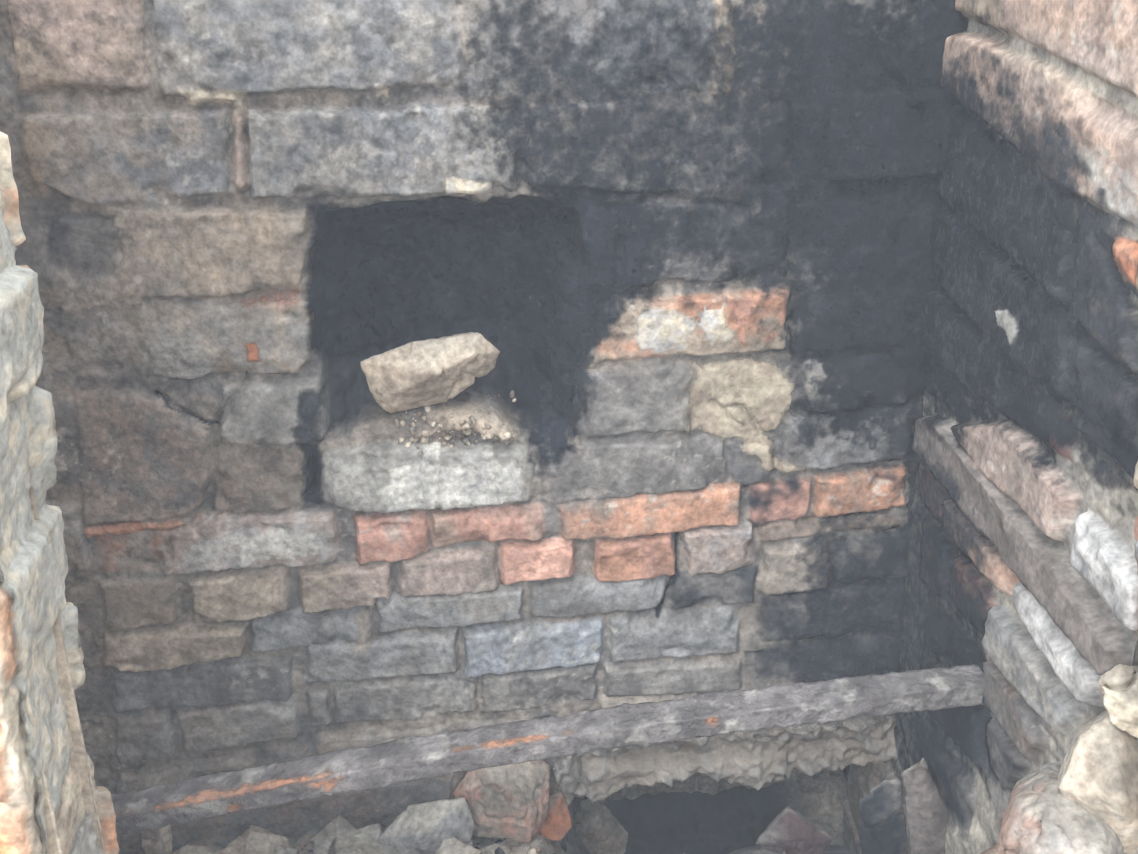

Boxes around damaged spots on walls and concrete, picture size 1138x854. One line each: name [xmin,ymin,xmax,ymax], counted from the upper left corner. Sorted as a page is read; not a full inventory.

crack [155,390,219,425]